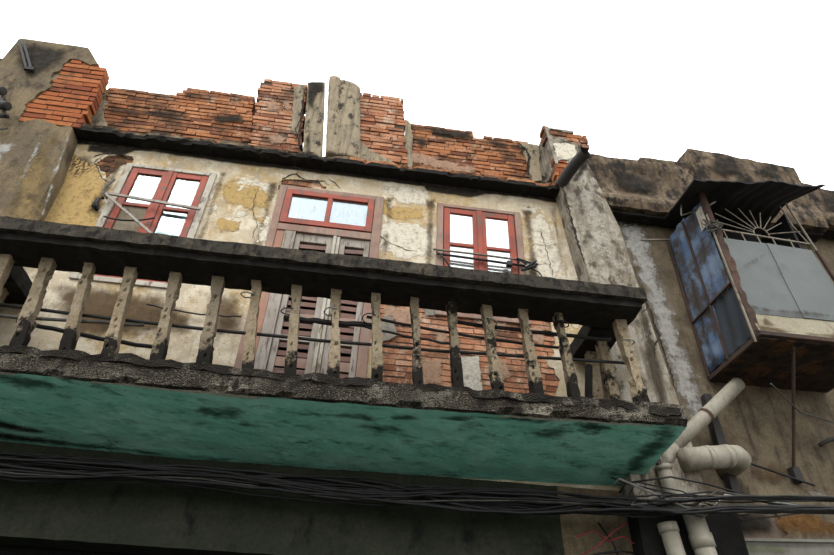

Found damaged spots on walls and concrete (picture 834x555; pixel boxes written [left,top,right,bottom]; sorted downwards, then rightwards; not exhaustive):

spalling [19,60,110,129]
peeling [10,136,134,226]
peeling [208,177,326,243]
peeling [379,185,435,260]
crack [531,231,553,276]
crack [562,187,587,266]
water stain [715,156,741,174]
water stain [824,195,834,212]
spalling [372,304,491,391]
spalling [494,320,559,396]
water stain [640,309,666,402]
corrosion [776,513,834,534]